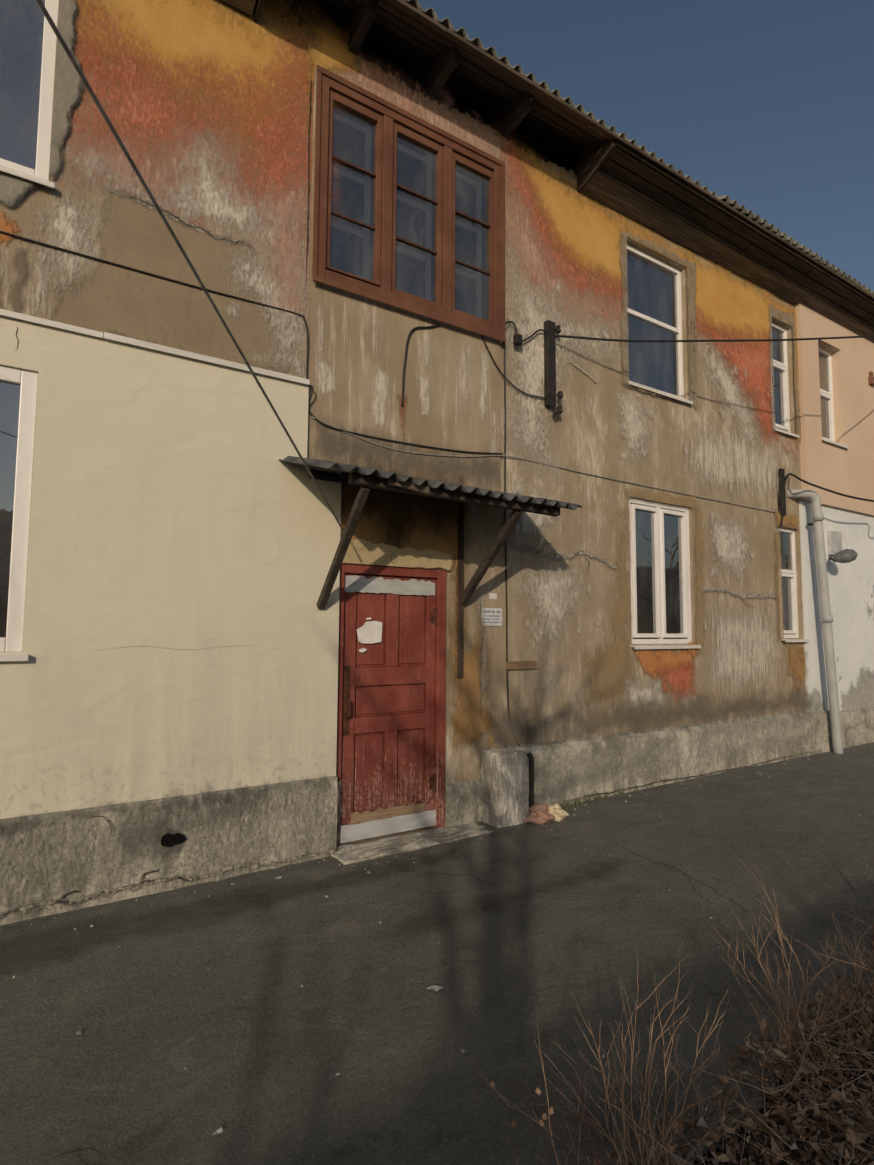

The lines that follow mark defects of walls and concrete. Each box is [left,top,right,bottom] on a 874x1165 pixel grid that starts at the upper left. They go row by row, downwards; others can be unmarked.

crack [103,185,250,247]
leakage [314,304,336,395]
leakage [318,314,500,479]
peeling [0,0,825,713]
crack [506,538,618,570]
leakage [497,512,810,747]
peeling [839,667,874,747]